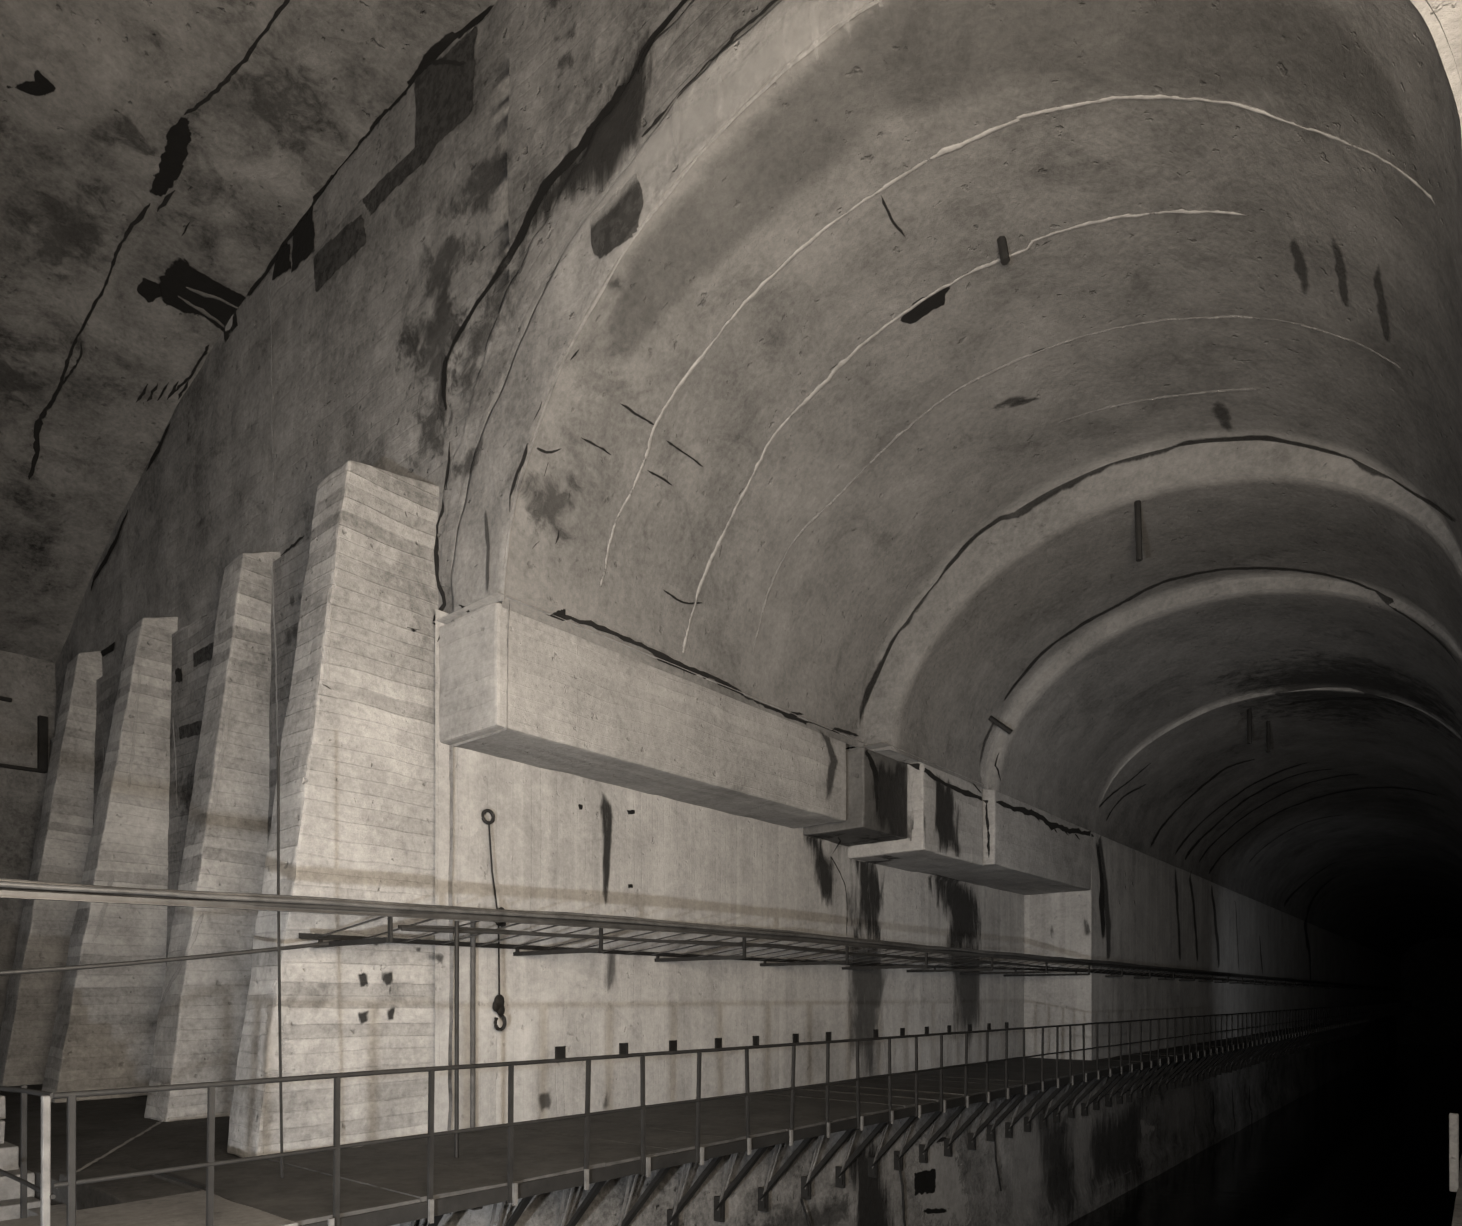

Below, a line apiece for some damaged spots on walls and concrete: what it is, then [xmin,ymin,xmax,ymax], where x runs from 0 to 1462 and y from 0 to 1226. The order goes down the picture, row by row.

spalling [6,70,55,96]
spalling [150,117,191,212]
crack [184,0,290,115]
crack [247,5,494,296]
peeling [272,27,478,292]
peeling [590,174,643,258]
crack [641,0,778,137]
crack [28,203,150,480]
spalling [136,258,246,402]
crack [407,0,687,642]
water stain [806,834,900,1074]
water stain [928,874,981,1035]